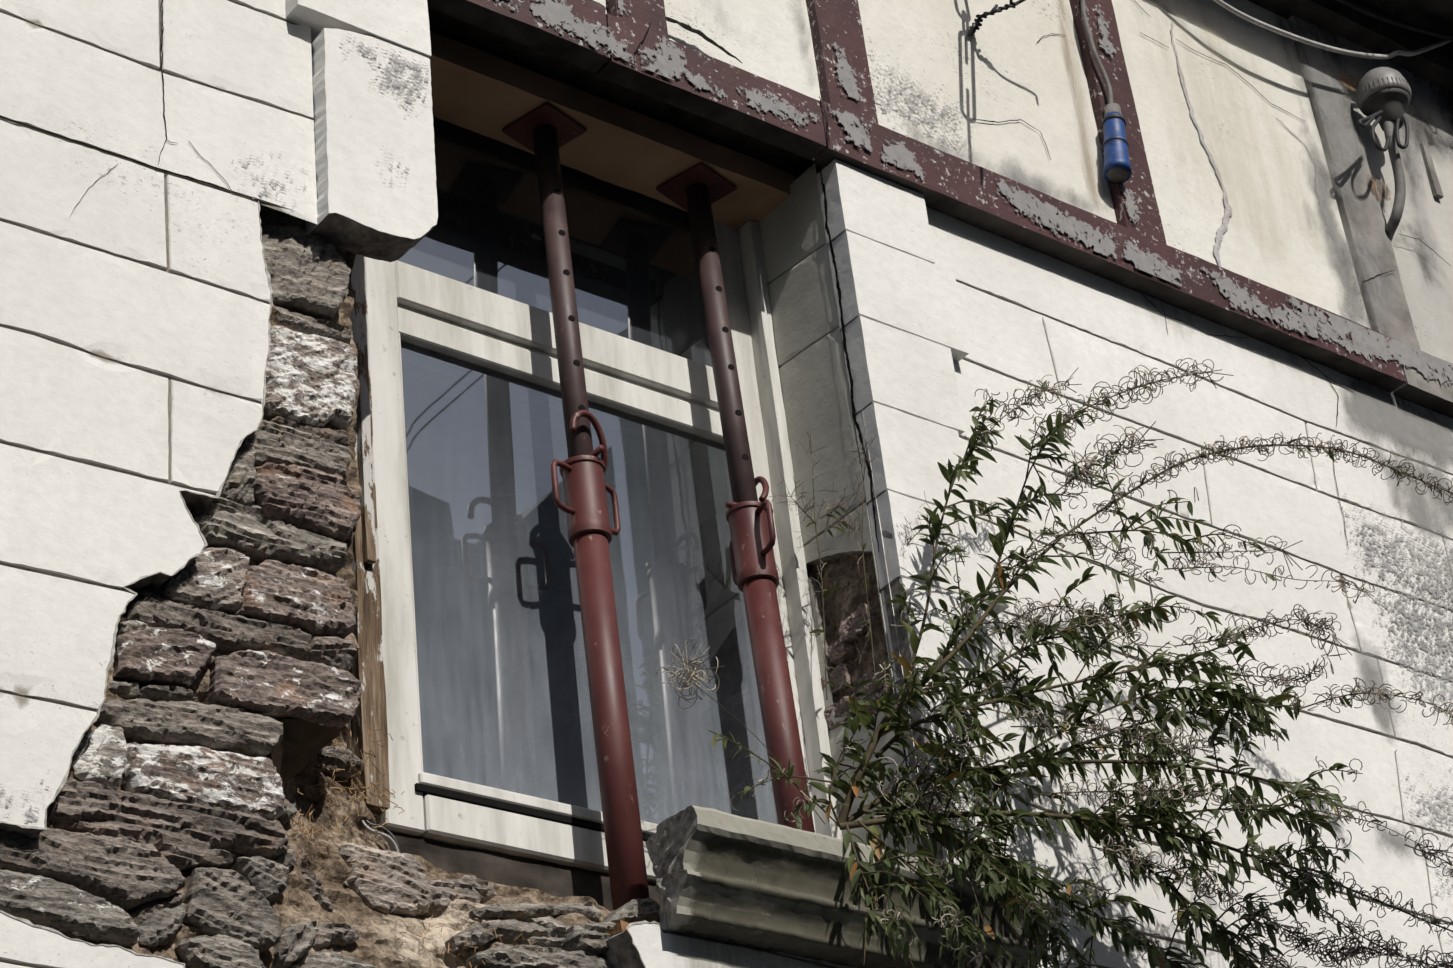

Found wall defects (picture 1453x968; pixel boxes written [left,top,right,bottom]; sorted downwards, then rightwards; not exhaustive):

crack [0,0,257,216]
peeling [340,35,429,118]
peeling [496,0,926,181]
peeling [1086,7,1118,71]
crack [1134,0,1319,267]
crack [819,96,879,551]
peeling [996,178,1453,385]
water stain [1345,380,1453,534]
flaking render [0,143,661,968]
flaking render [806,549,897,730]
water stain [1362,652,1393,728]